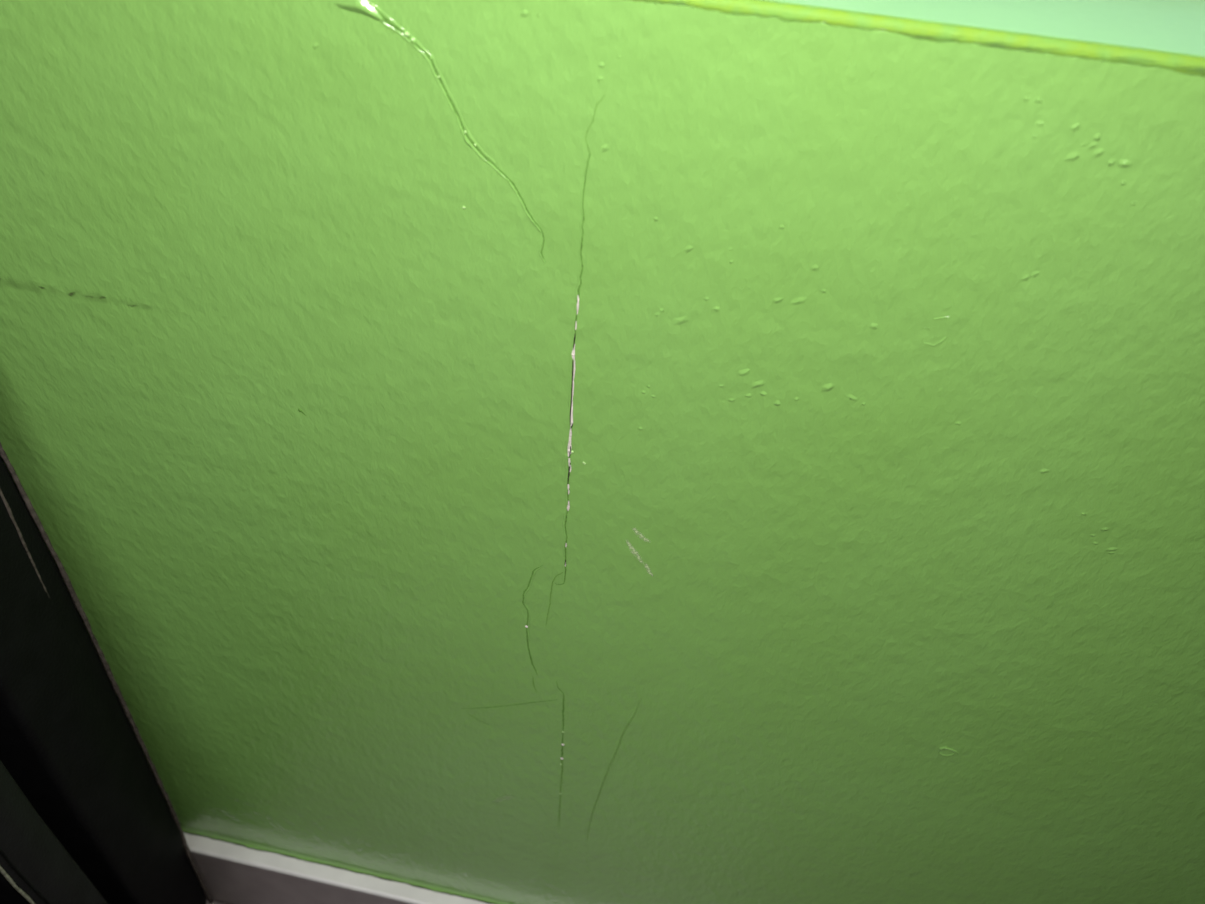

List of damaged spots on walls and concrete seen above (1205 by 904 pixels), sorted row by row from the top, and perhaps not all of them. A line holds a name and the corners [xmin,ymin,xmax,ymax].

crack [367,1,546,263]
crack [522,95,642,844]